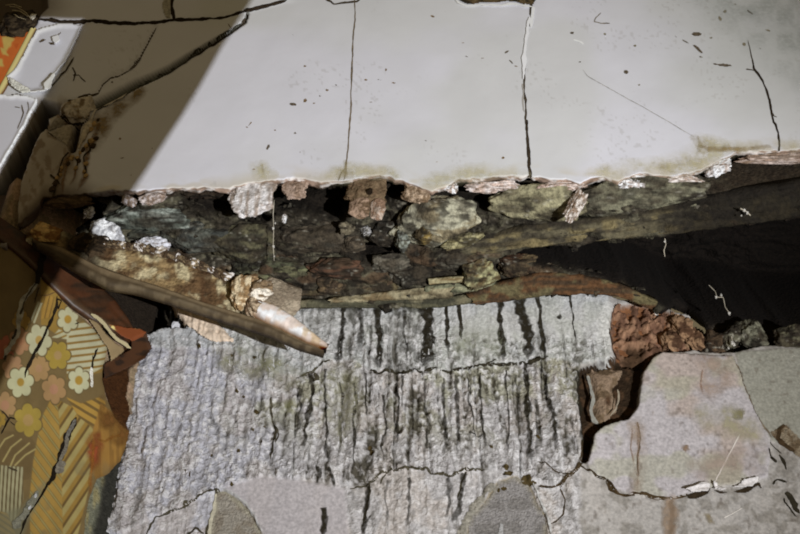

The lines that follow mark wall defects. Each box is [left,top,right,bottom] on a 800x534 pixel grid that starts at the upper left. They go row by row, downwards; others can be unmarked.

crack [38,0,287,186]
crack [522,4,535,178]
crack [746,42,780,151]
water stain [296,369,335,485]
water stain [373,308,383,365]
crack [350,465,487,519]
water stain [418,305,464,363]
crack [370,356,549,375]
water stain [442,372,486,446]
water stain [497,302,507,358]
water stain [504,297,557,456]
crack [539,422,691,524]